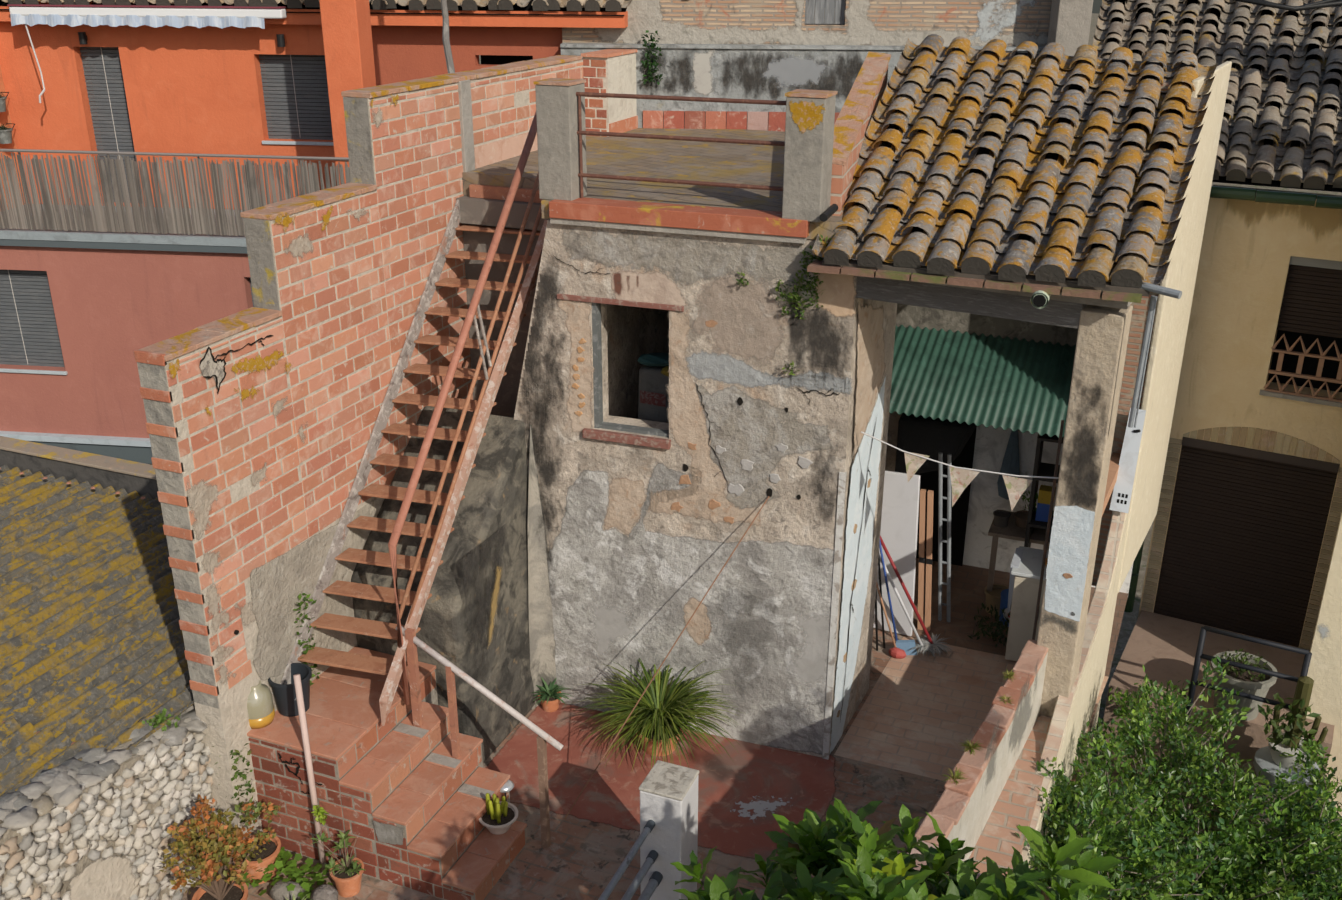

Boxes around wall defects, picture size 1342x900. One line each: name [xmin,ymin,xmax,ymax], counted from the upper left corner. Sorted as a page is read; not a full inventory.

leakage [642,49,863,99]
crack [200,335,274,393]
leakage [522,269,564,564]
spalling [557,230,886,753]
leakage [814,456,834,517]